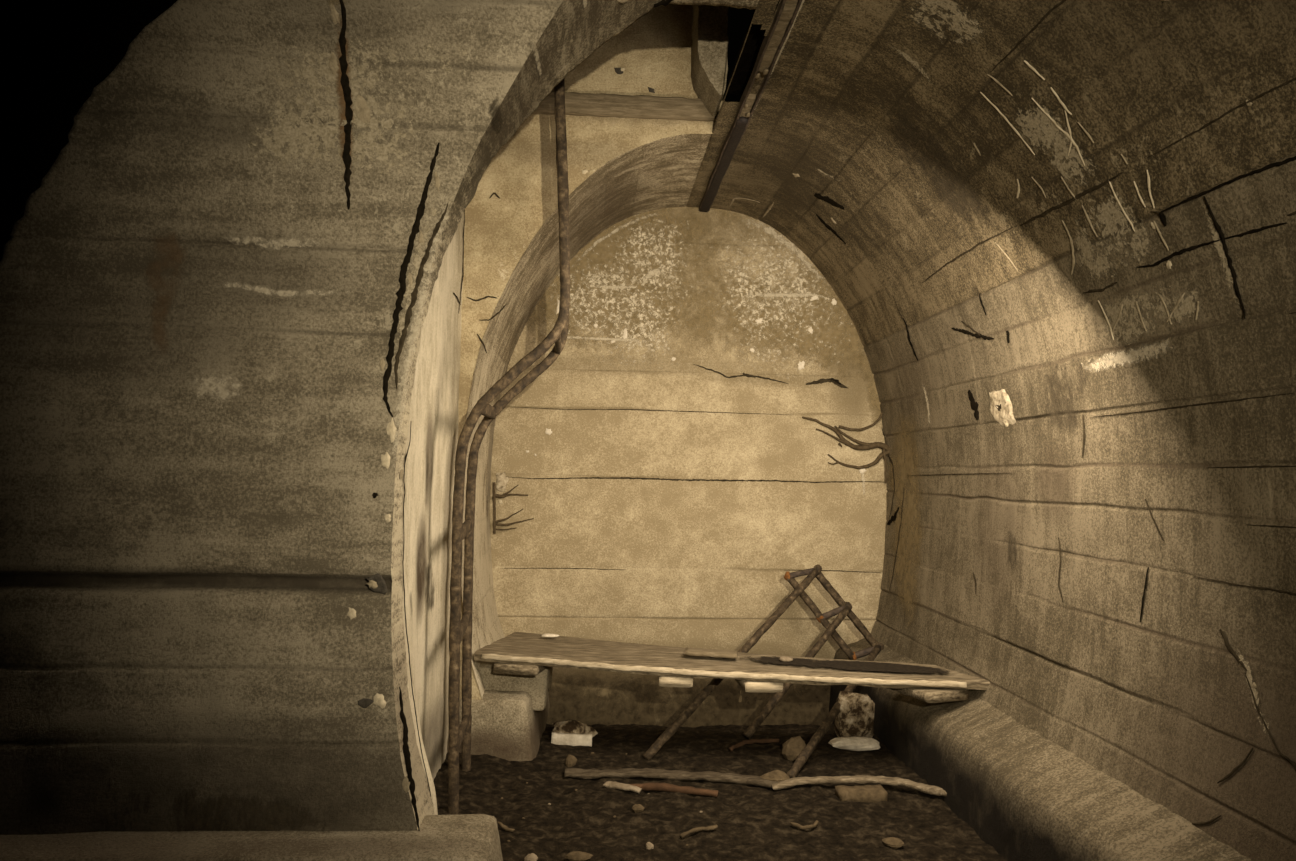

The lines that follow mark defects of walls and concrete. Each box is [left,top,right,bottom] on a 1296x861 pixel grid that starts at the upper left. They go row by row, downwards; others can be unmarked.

crack [328,0,371,209]
spalling [372,208,448,498]
crack [379,143,448,831]
leakage [411,565,434,609]
crack [522,364,848,415]
crack [512,428,1001,590]
crack [892,295,930,423]
crack [951,294,1010,343]
spalling [968,389,1016,427]
crack [922,78,1296,283]
crack [1082,393,1293,458]
crack [1083,156,1296,319]